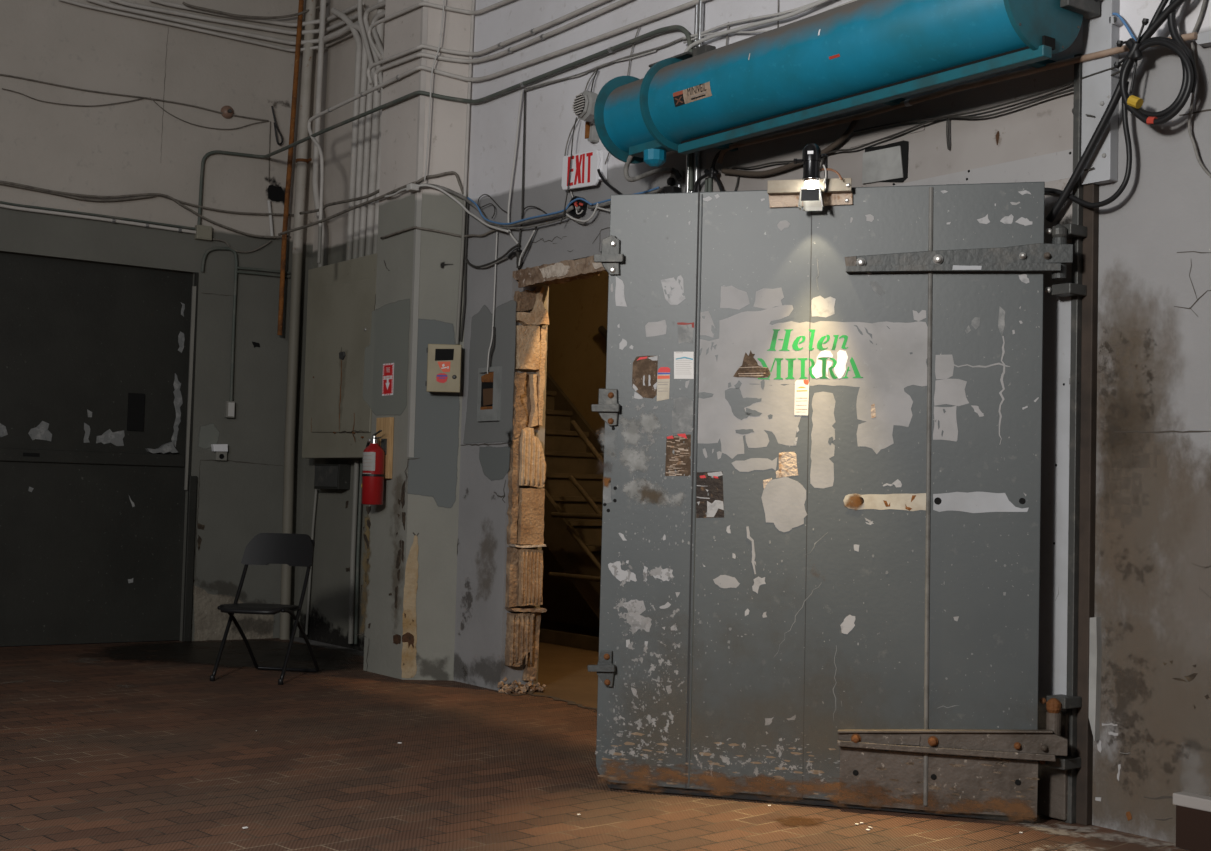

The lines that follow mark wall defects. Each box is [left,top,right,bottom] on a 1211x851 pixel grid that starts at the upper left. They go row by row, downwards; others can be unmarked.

spalling [513,251,627,307]
crack [1174,251,1211,314]
peeling [998,307,1022,336]
peeling [28,421,52,441]
peeling [84,409,125,446]
peeling [145,374,183,454]
peeling [672,286,984,532]
flaking render [389,481,419,678]
water stain [1092,298,1211,844]
peeling [595,533,824,784]
corrosion [602,762,1035,820]